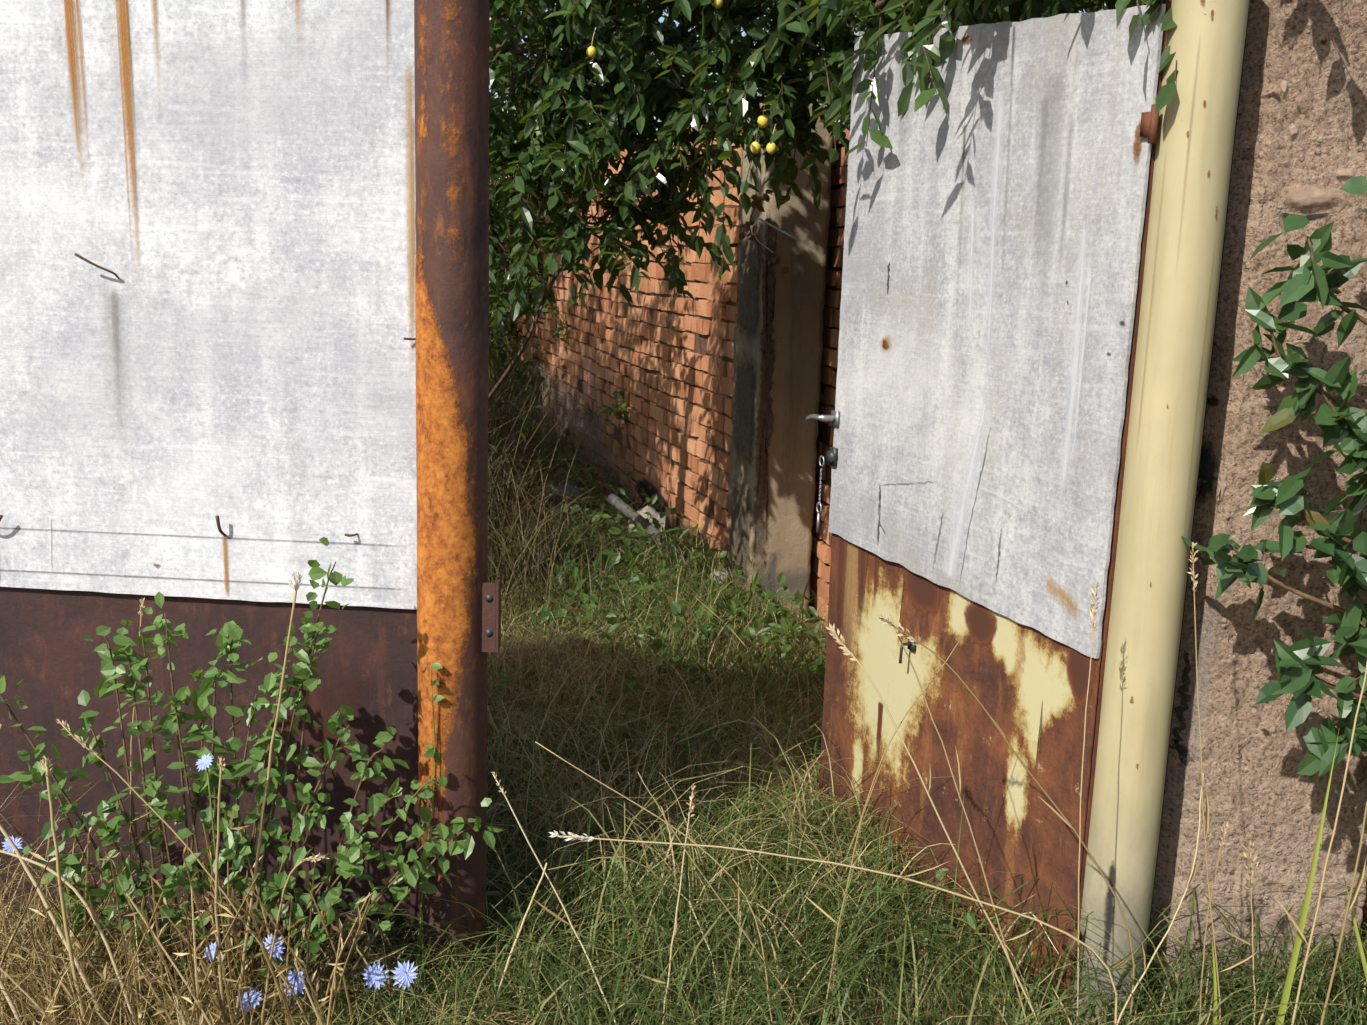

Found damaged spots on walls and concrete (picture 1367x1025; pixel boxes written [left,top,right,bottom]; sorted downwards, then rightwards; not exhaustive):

rust [64,0,84,110]
rust [116,0,135,189]
rust [408,75,477,814]